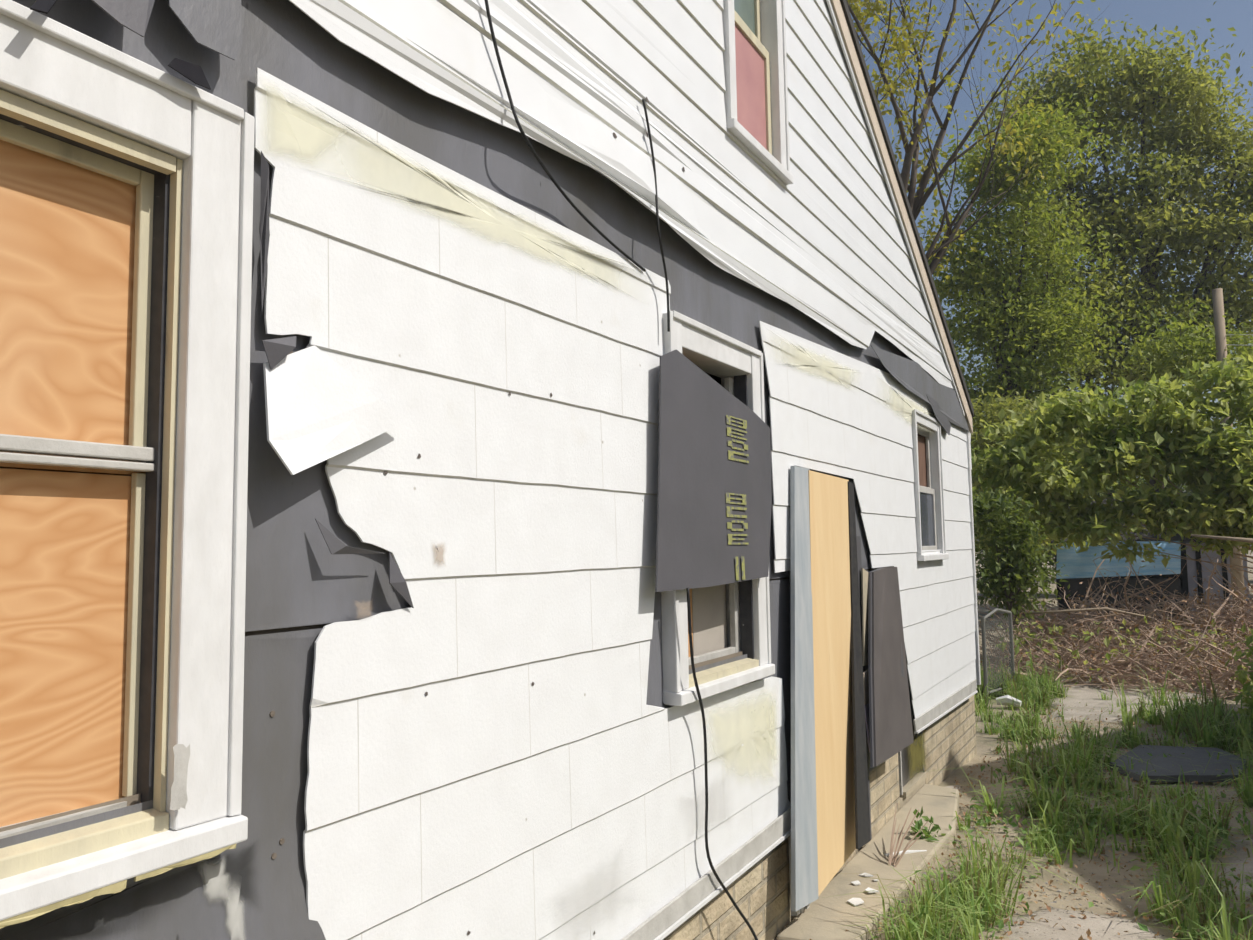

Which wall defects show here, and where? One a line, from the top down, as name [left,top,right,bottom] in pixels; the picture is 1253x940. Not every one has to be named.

peeling [170,744,190,811]